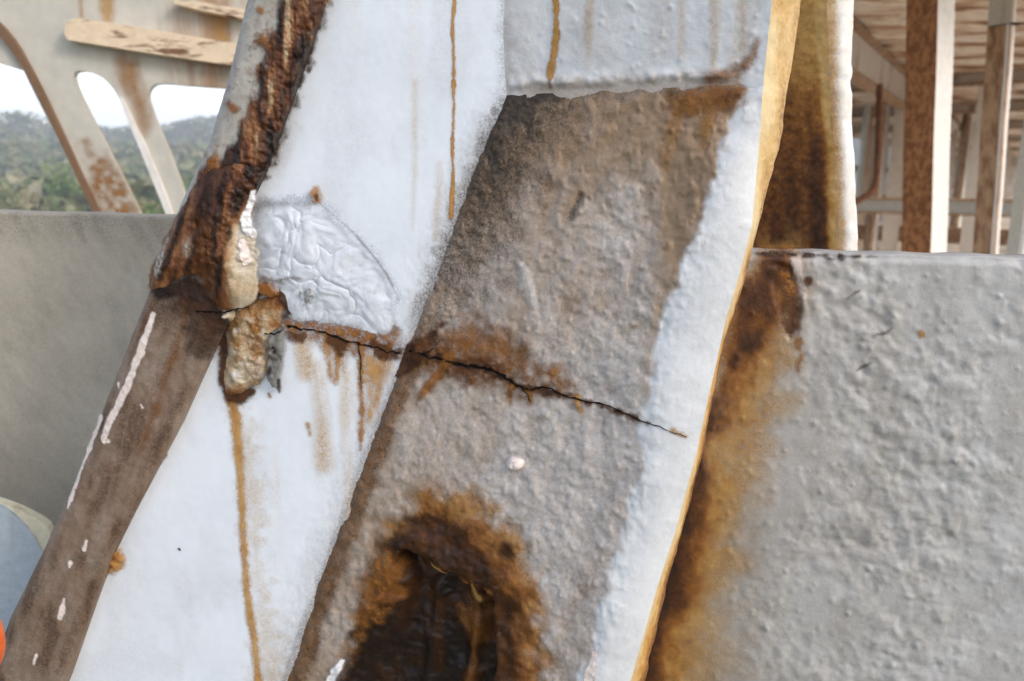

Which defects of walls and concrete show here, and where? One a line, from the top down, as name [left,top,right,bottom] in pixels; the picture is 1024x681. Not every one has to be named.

rust [546,0,560,88]
peeling [238,190,257,266]
rust [310,186,322,203]
crack [287,324,686,437]
rust [195,281,649,681]
rust [645,244,872,681]